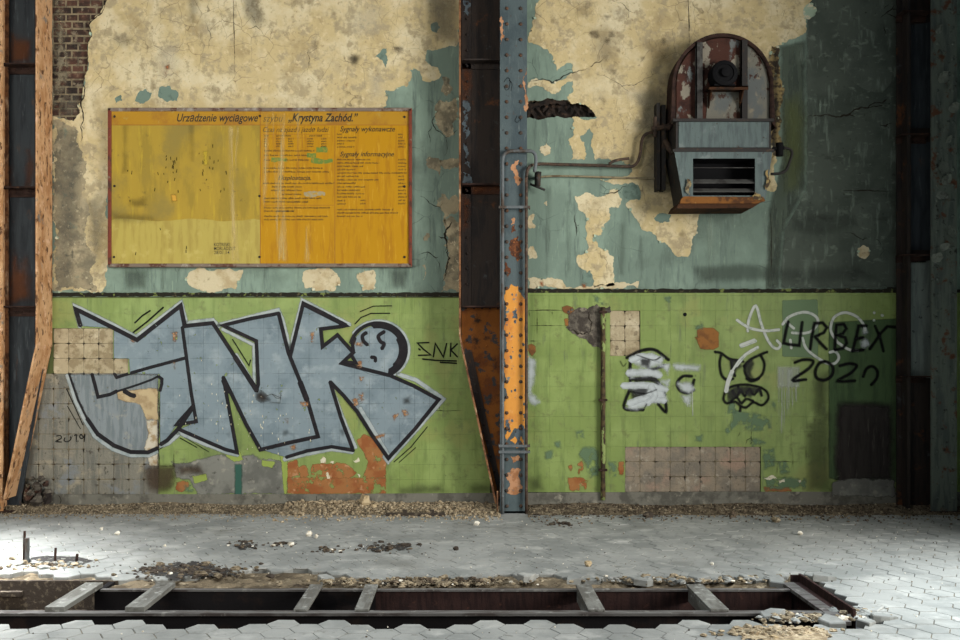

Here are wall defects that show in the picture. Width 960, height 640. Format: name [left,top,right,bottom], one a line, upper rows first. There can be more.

crack [535,59,649,86]
peeling [52,0,459,293]
peeling [527,0,817,289]
crack [809,98,891,128]
peeling [566,304,640,356]
peeling [23,328,158,494]
peeling [260,415,390,494]